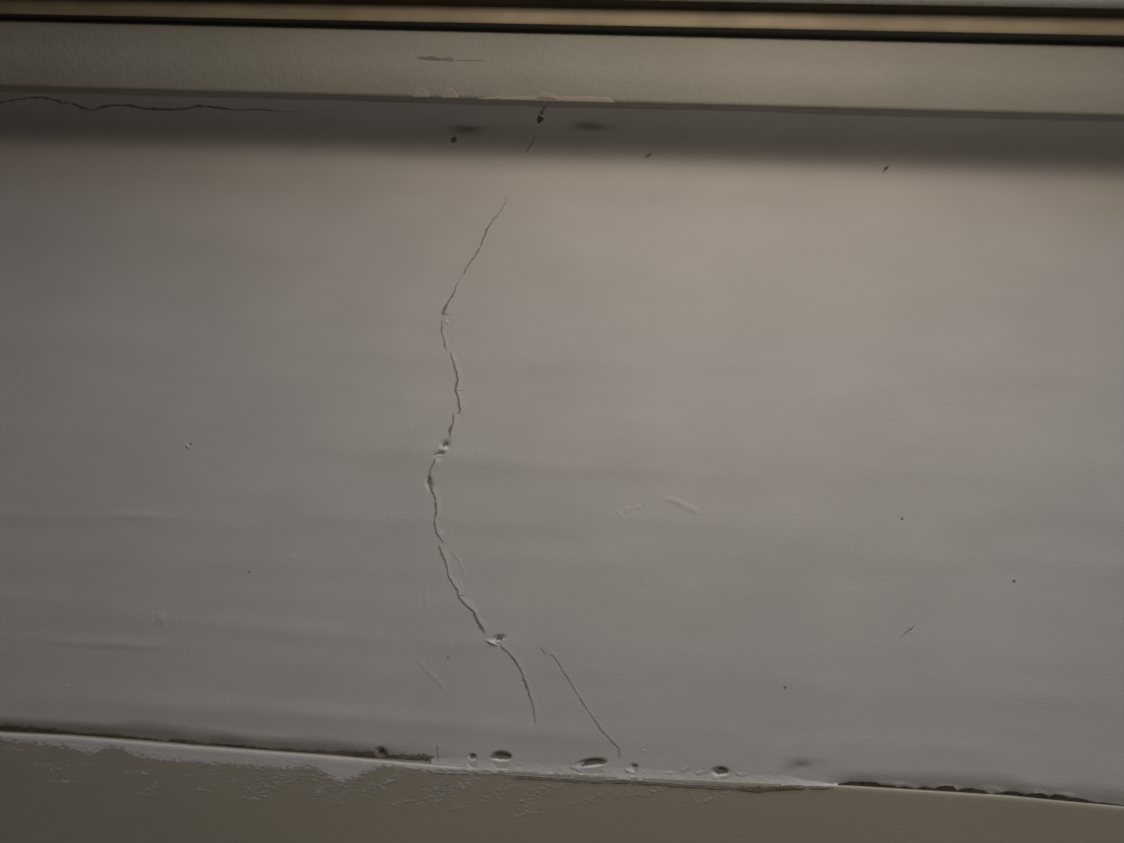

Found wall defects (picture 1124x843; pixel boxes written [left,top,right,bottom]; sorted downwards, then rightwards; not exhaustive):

crack [427,195,834,792]
hole [490,752,512,764]
hole [580,759,607,770]
spalling [713,767,728,779]